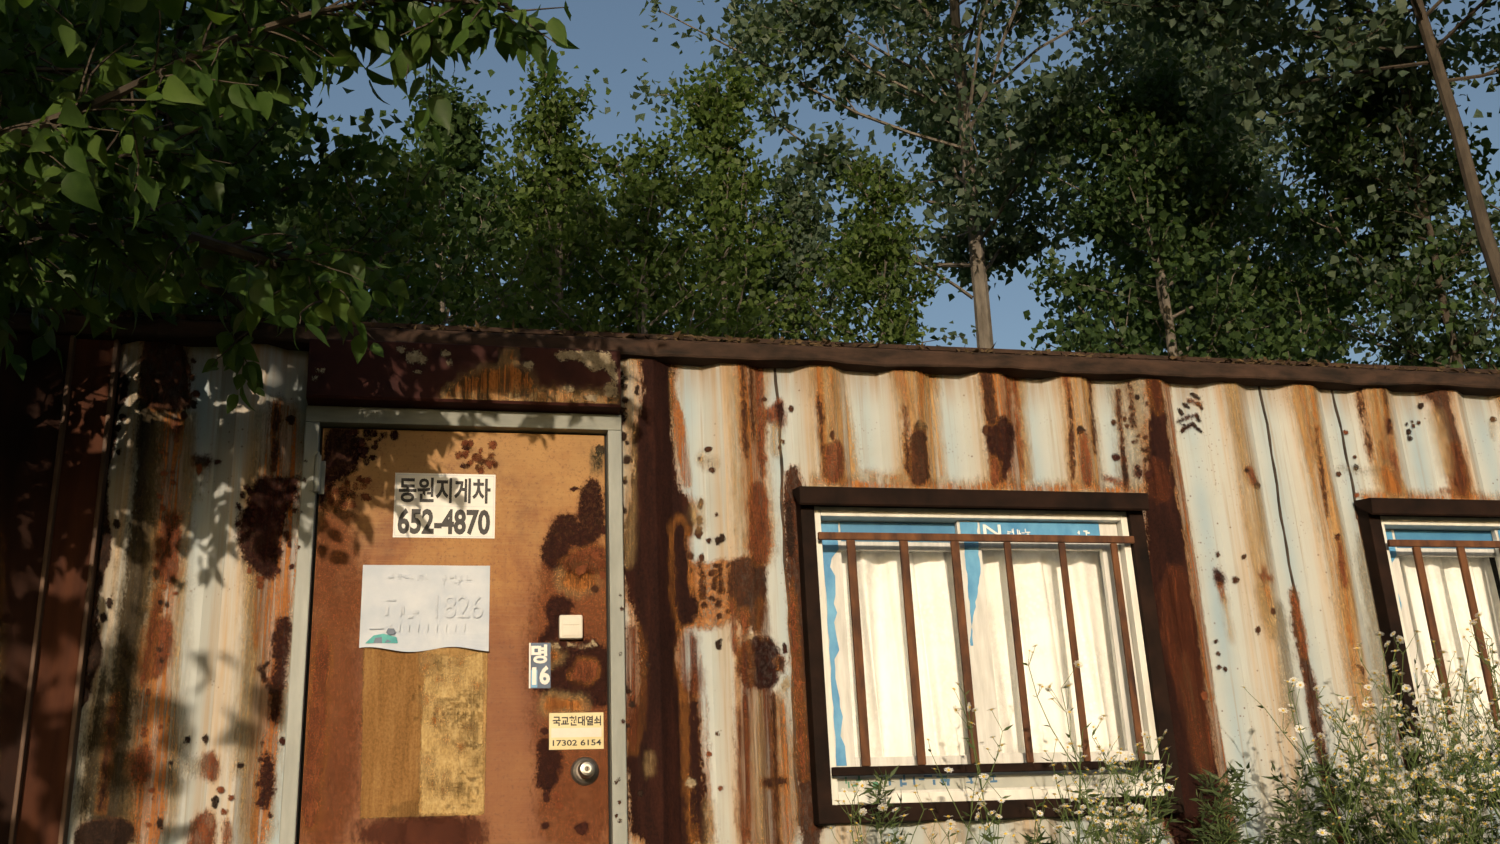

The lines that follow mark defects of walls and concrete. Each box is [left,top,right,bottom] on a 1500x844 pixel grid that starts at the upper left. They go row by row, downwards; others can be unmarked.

corrosion [125,398,489,844]
peeling [553,349,619,402]
corrosion [442,351,1345,844]
corrosion [1292,384,1500,754]